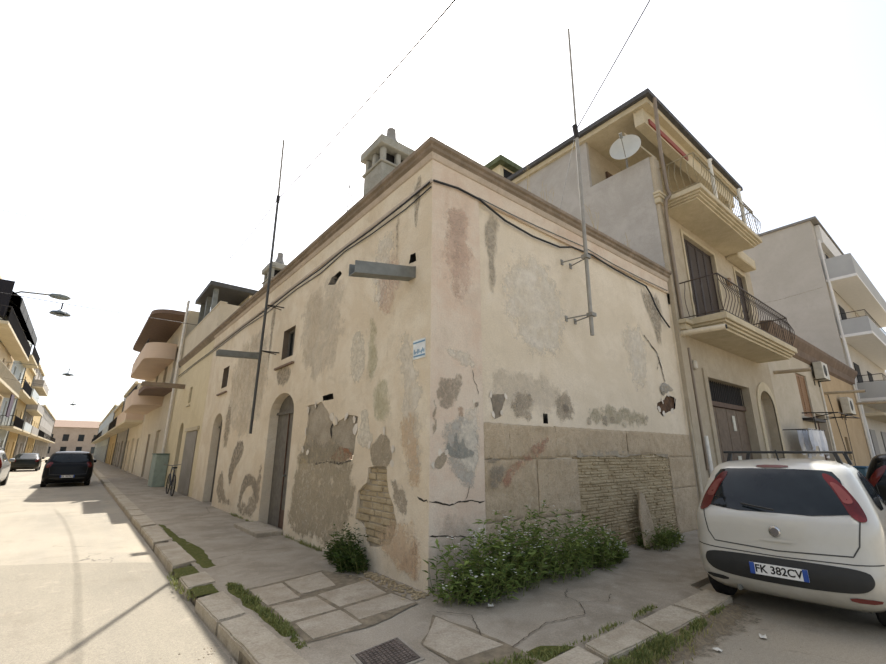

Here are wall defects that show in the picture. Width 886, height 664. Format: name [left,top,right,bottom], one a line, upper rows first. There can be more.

peeling [433,375,462,432]
peeling [489,390,507,419]
spalling [657,391,675,417]
peeling [459,399,500,471]
spalling [301,395,419,547]
spalling [431,449,449,469]
crack [418,485,484,506]